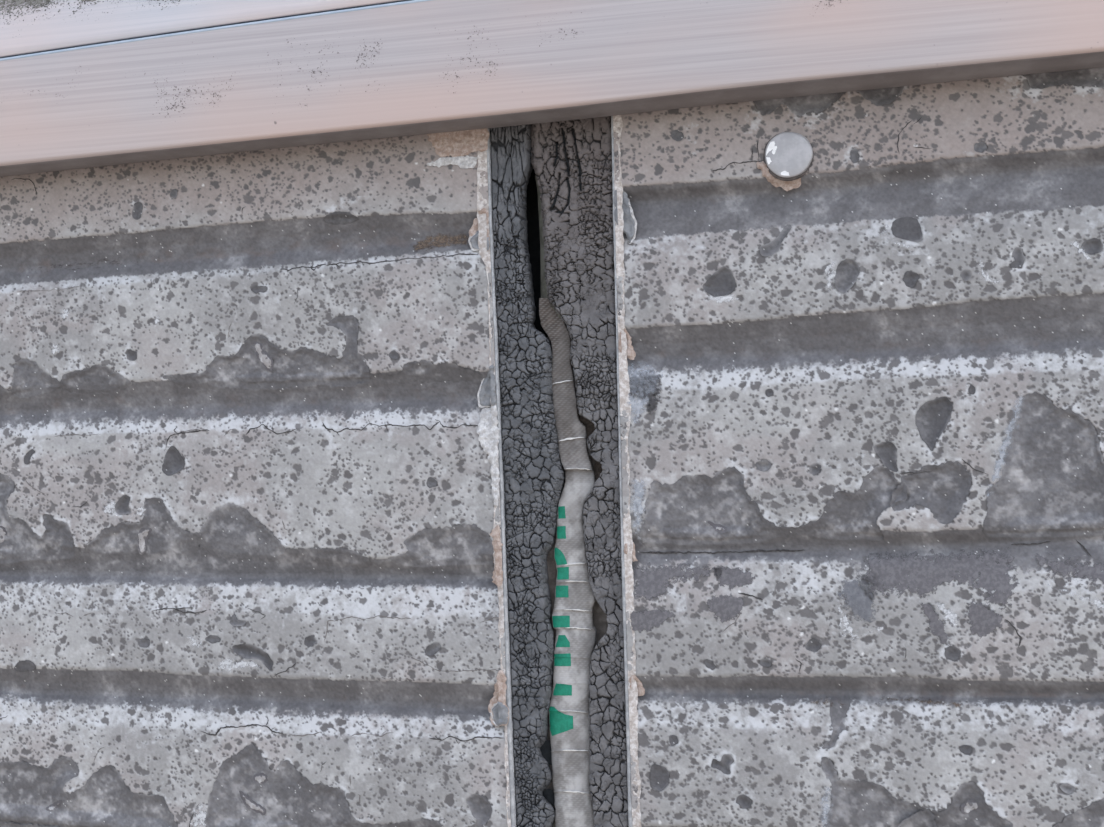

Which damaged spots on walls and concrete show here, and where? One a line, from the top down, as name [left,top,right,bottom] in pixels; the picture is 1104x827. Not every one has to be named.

crack [550,129,582,213]
spalling [0,359,132,401]
spalling [915,397,952,451]
spalling [0,474,503,587]
spalling [624,441,972,562]
spalling [983,392,1104,544]
spalling [0,756,178,827]
spalling [204,743,443,827]
spalling [466,794,492,827]
spalling [821,696,1012,827]
spalling [1060,783,1075,794]
spalling [1053,798,1104,827]